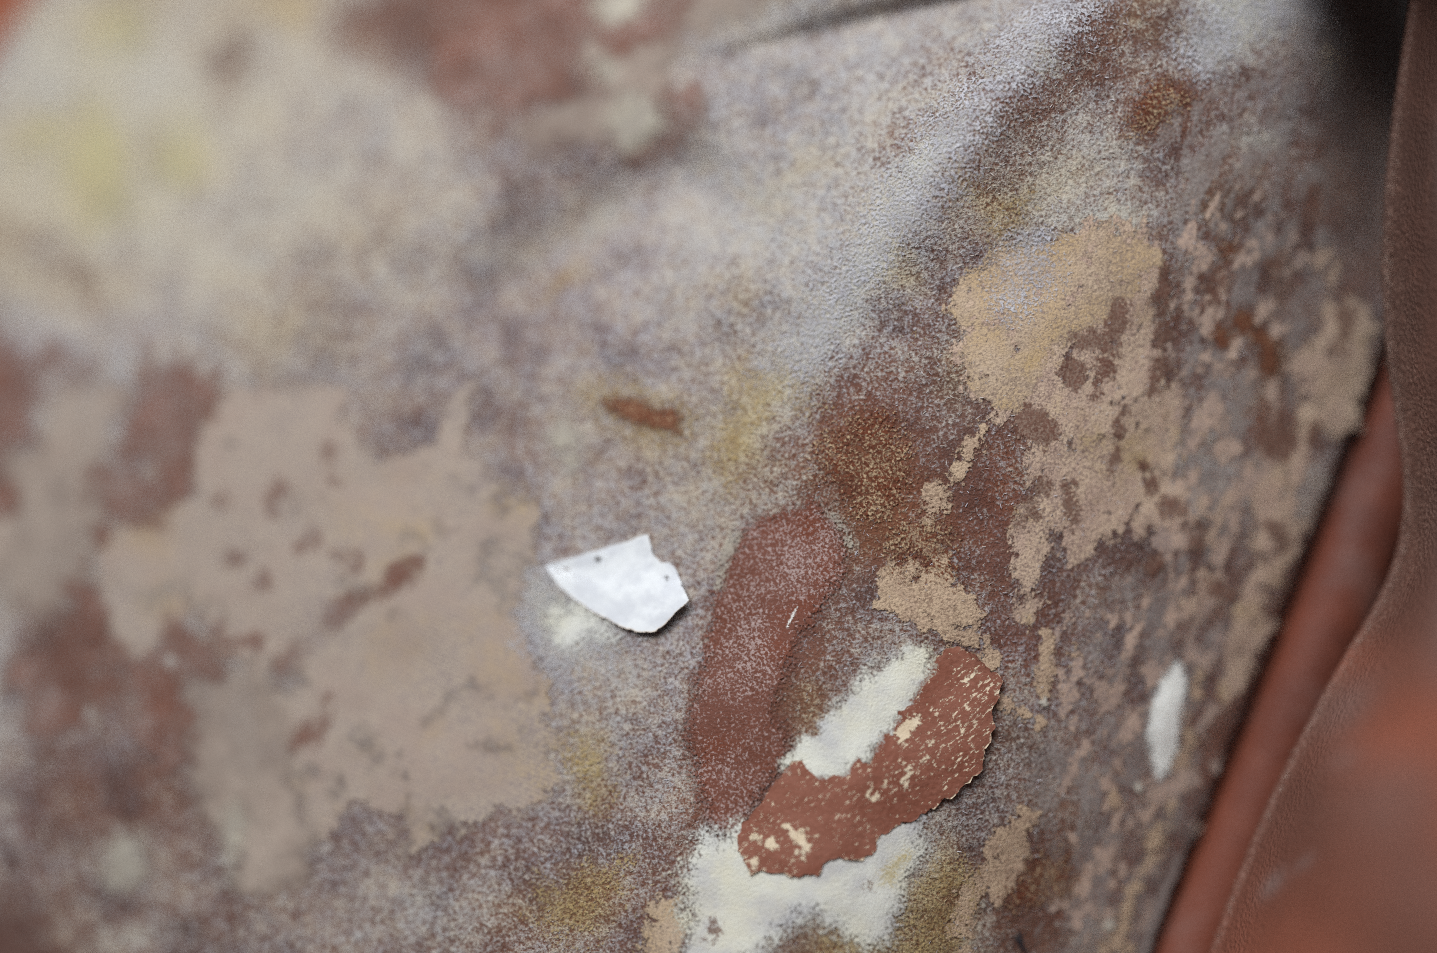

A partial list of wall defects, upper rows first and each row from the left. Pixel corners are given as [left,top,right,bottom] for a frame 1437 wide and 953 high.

rust [1118,70,1205,149]
peeling [93,376,689,866]
peeling [634,179,1381,953]